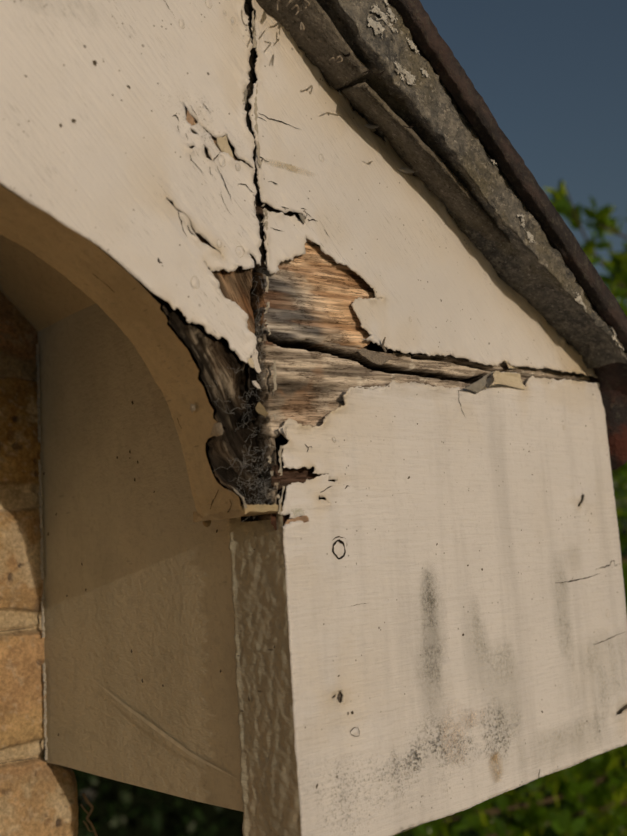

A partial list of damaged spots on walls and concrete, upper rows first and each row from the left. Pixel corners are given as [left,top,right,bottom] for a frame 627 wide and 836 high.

crack [167,3,328,522]
peeling [208,239,590,440]
peeling [271,510,309,530]
peeling [270,465,335,490]